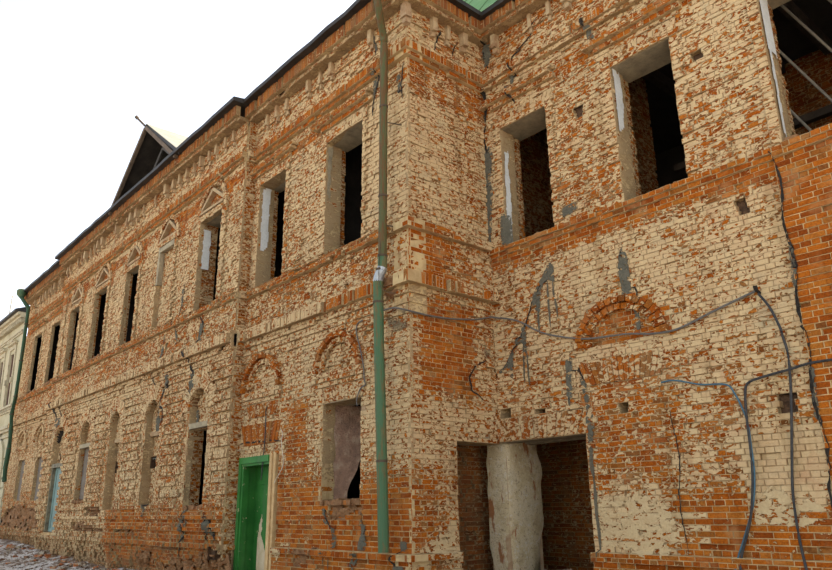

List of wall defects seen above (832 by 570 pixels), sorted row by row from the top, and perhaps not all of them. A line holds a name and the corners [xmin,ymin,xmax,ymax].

flaking render [612,69,624,132]
flaking render [760,0,787,137]
flaking render [201,230,211,270]
flaking render [260,188,272,251]
flaking render [504,151,513,235]
crack [152,289,203,436]
crack [469,262,558,400]
crack [768,151,832,508]
crack [149,456,157,468]
peeling [256,518,317,570]
flaking render [598,494,686,561]
flaking render [753,486,824,528]